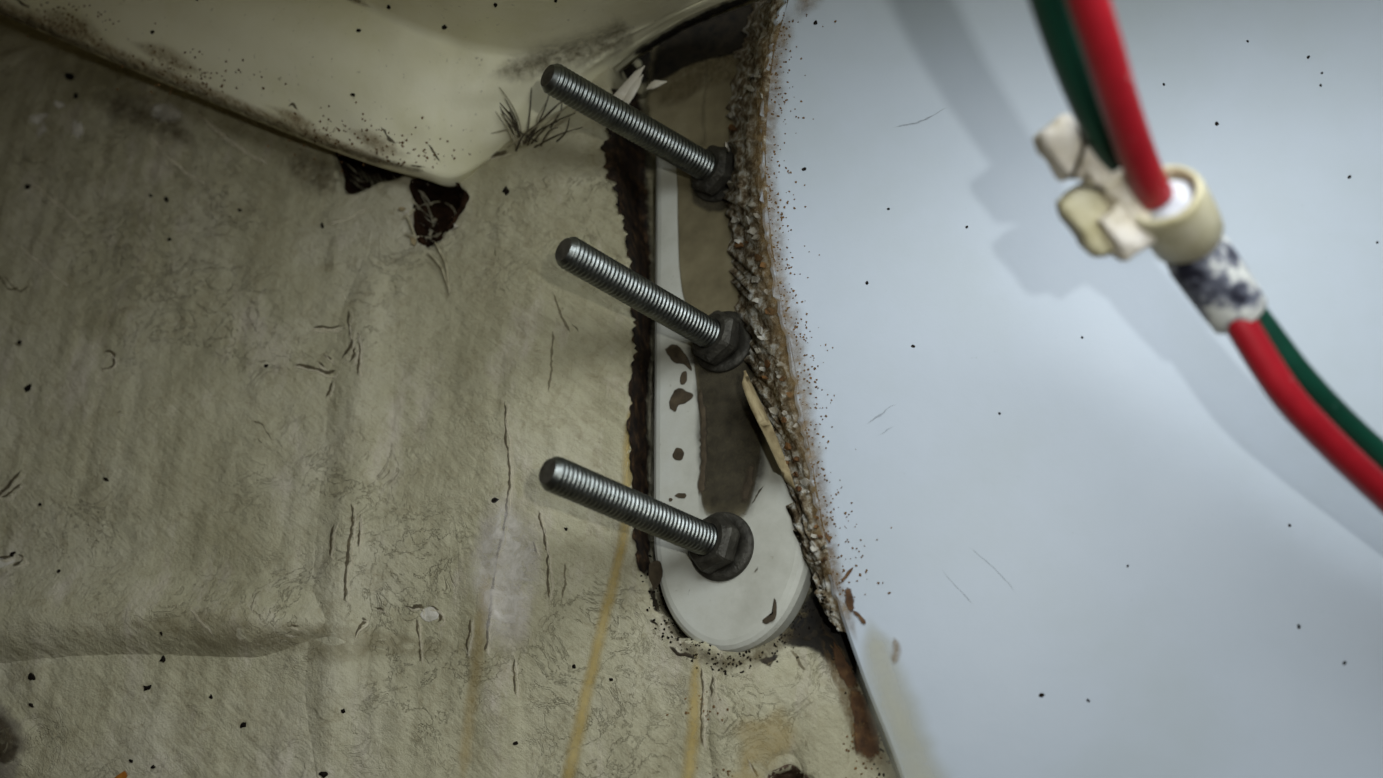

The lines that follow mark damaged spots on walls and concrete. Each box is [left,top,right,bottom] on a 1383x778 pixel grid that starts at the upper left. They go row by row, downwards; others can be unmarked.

peeling [613,46,738,149]
peeling [676,167,739,315]
rust [759,0,891,624]
peeling [666,344,797,516]
rust [832,642,879,758]